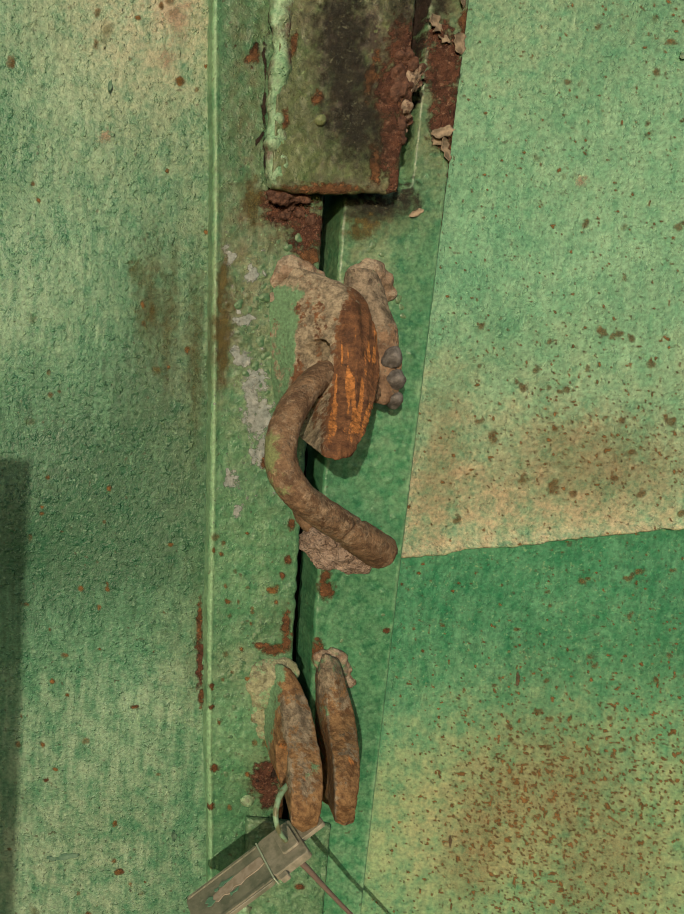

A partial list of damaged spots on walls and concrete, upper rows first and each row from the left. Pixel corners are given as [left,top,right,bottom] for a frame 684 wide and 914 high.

peeling [429,13,466,55]
rust [245,9,468,265]
peeling [430,125,455,162]
peeling [221,244,237,266]
peeling [244,249,266,283]
peeling [228,309,275,469]
peeling [217,468,241,490]
rust [316,570,335,599]
rust [255,610,293,656]
rust [240,761,283,819]